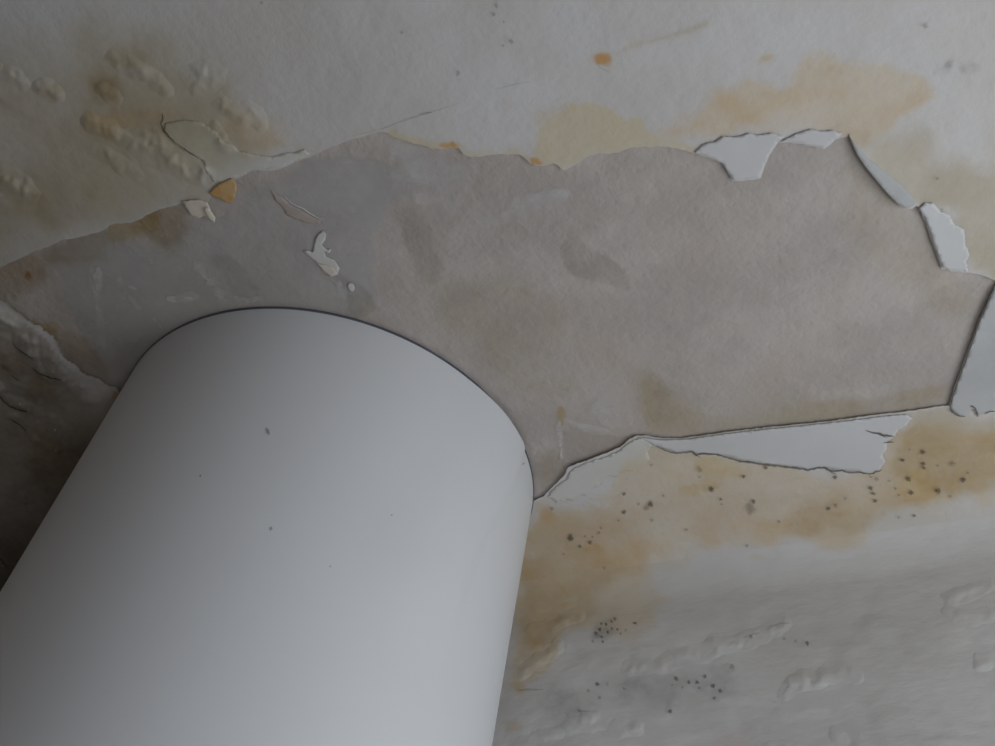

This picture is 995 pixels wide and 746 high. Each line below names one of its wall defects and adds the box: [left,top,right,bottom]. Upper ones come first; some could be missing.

crack [160,114,197,158]
peeling [0,132,995,500]